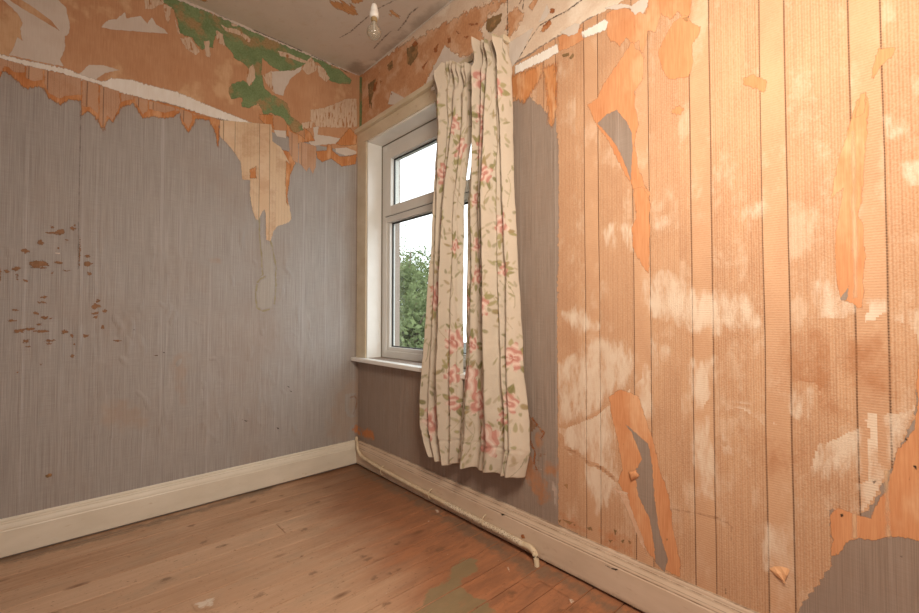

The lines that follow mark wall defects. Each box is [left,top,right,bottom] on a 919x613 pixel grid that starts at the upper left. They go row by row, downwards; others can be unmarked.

flaking render [605,0,648,15]
flaking render [4,0,70,66]
flaking render [102,13,168,34]
crack [507,0,582,56]
flaking render [561,23,580,36]
flaking render [79,65,117,79]
flaking render [272,66,302,95]
flaking render [309,126,356,156]
peeling [0,224,93,282]
peeling [9,296,52,347]